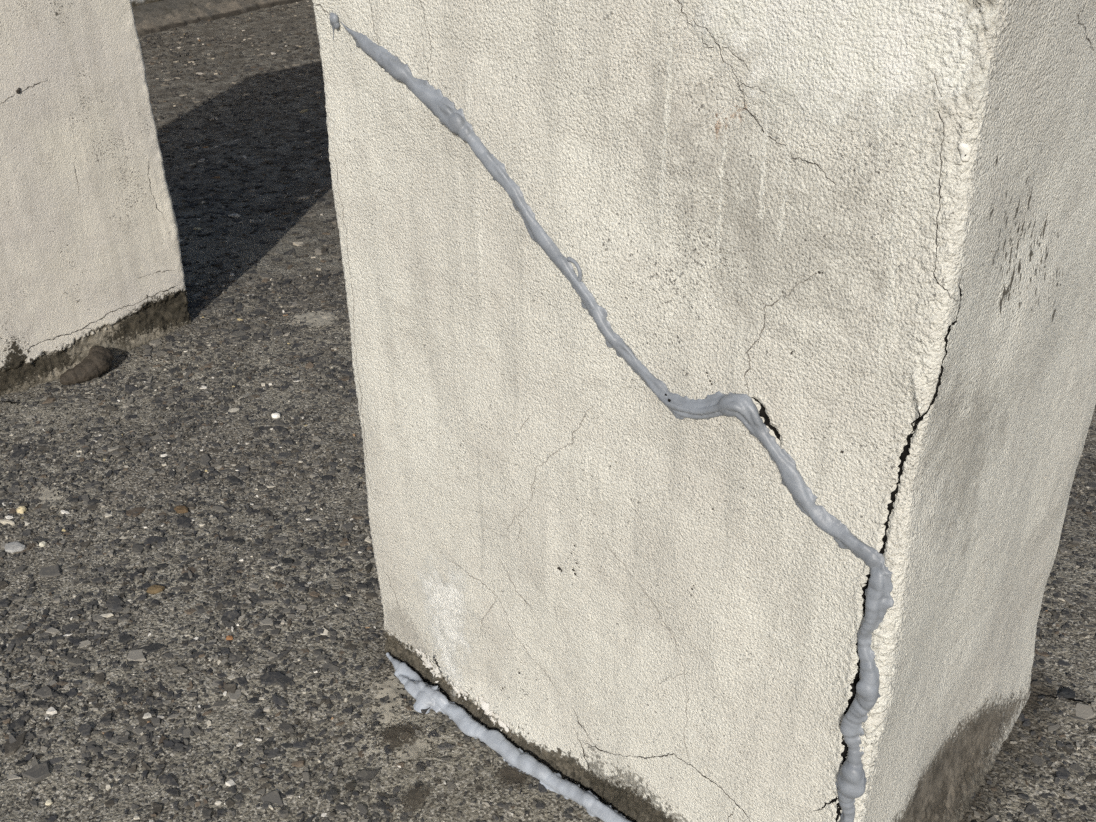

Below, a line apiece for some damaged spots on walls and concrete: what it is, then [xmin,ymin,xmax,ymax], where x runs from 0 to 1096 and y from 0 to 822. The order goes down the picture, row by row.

crack [678,0,835,184]
crack [1,270,176,351]
crack [492,410,588,539]
crack [744,272,816,445]
crack [841,74,963,765]
crack [444,558,552,683]
leakage [374,720,426,751]
leakage [494,763,531,794]
crack [574,549,750,822]
crack [815,796,841,822]